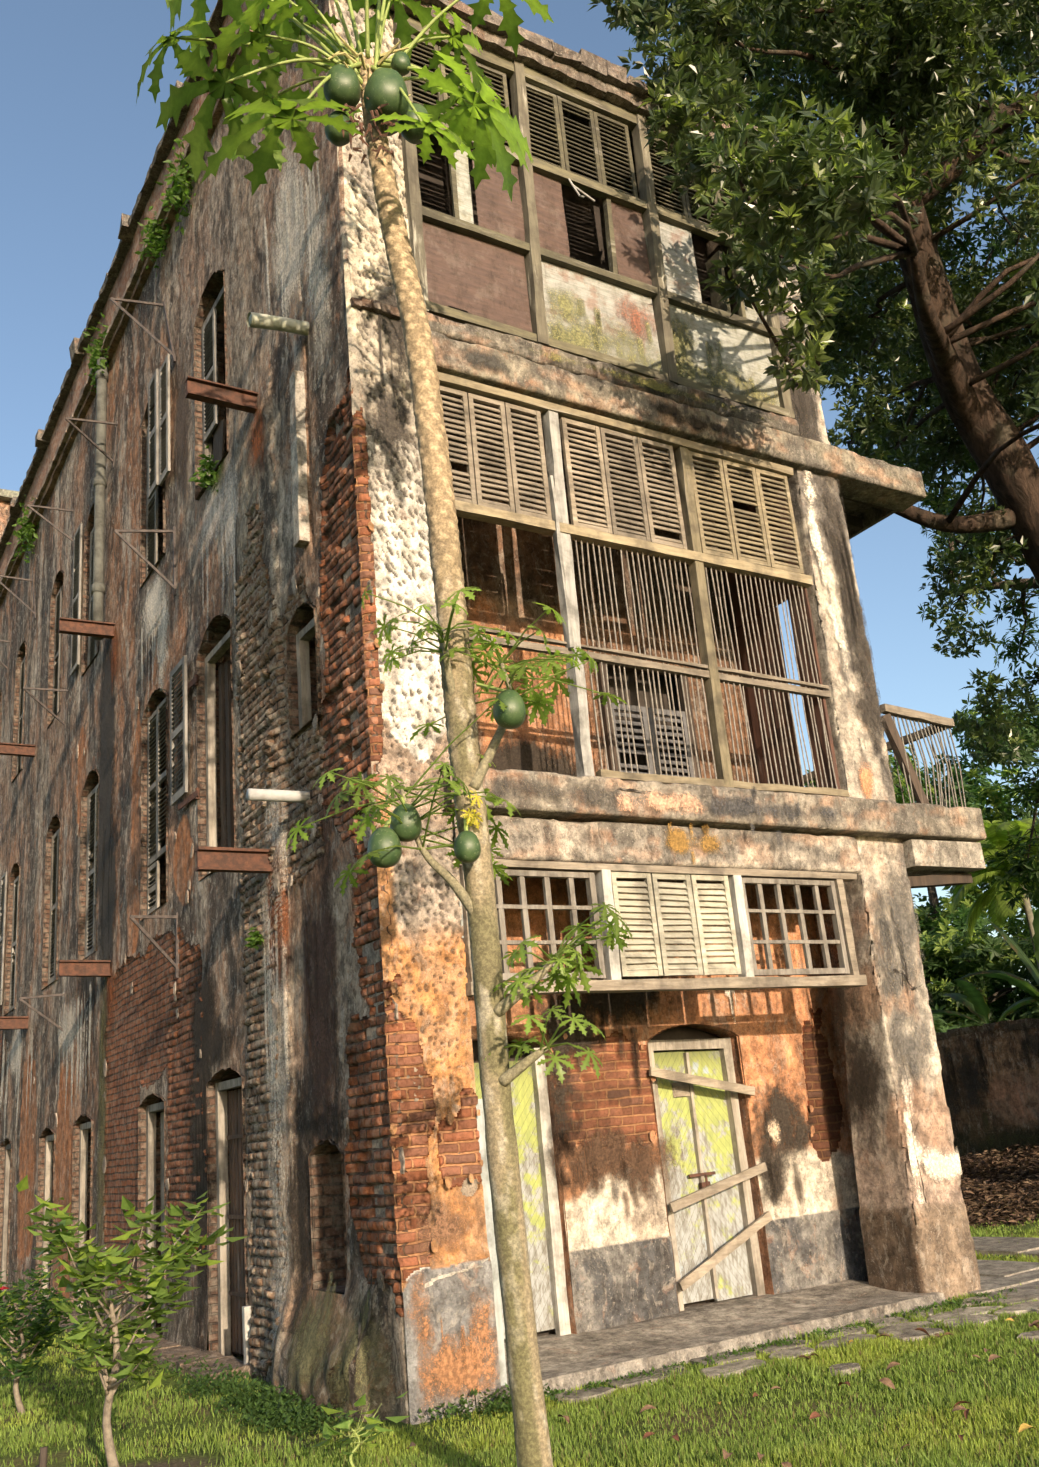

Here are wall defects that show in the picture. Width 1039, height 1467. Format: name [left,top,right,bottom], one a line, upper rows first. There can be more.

leakage [578,299,603,348]
leakage [705,341,722,367]
leakage [651,399,741,454]
flaking render [76,726,87,836]
spalling [233,366,489,1378]
spalling [102,697,207,1294]
leakage [264,794,336,1195]
spalling [549,1031,695,1149]
spalling [802,1008,845,1162]
leakage [765,1110,803,1202]